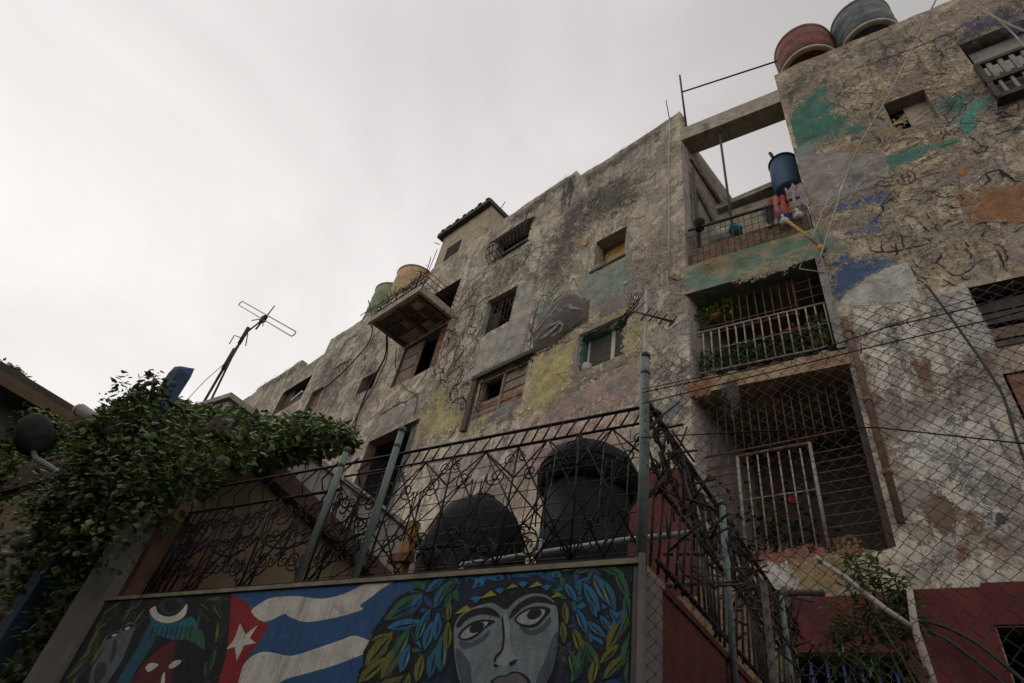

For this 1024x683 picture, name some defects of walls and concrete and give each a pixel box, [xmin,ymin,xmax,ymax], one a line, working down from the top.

spalling [917,491,1016,565]